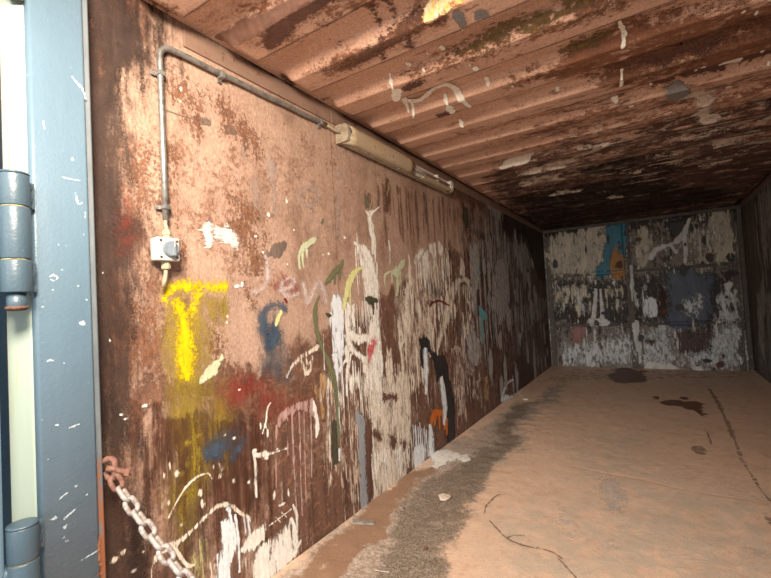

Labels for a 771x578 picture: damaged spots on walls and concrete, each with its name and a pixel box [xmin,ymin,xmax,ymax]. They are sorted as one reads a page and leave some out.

peeling [422,0,489,28]
corrosion [239,0,449,78]
peeling [518,163,595,177]
peeling [545,226,610,281]
peeling [619,226,654,268]
peeling [690,210,738,276]
peeling [587,312,611,327]
peeling [691,287,749,371]
peeling [557,334,653,368]
peeling [645,361,680,369]
damp [413,347,455,463]
damp [653,396,708,416]